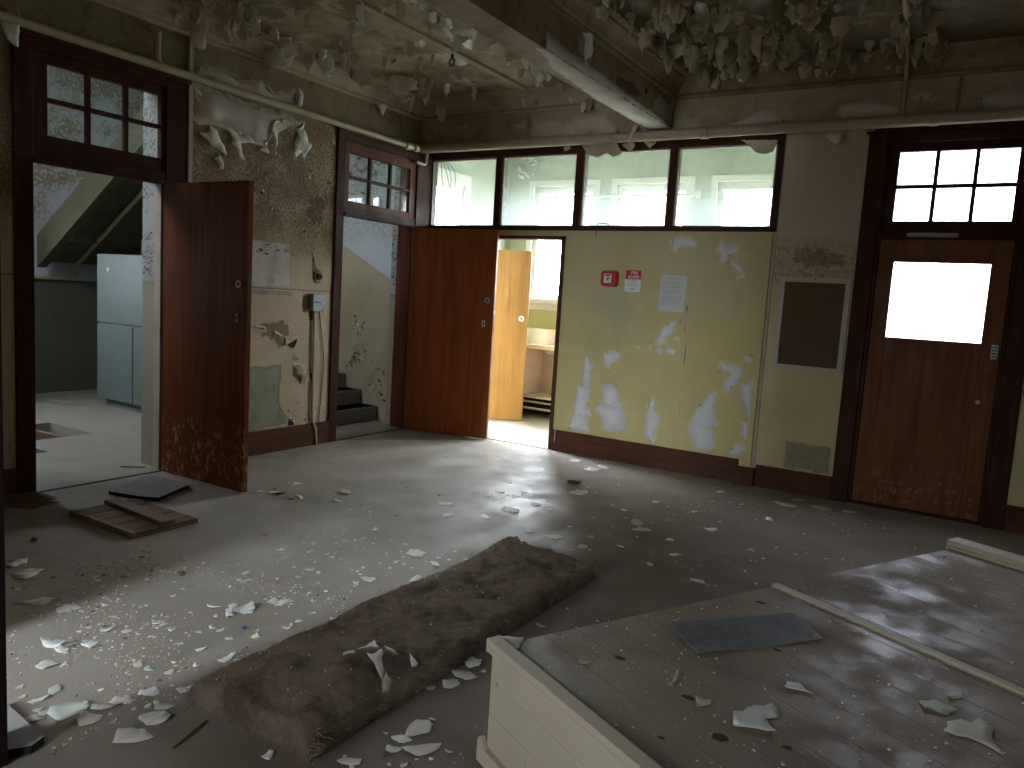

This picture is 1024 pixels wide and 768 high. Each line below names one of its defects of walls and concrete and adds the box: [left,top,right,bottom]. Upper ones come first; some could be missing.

peeling [349,0,496,122]
peeling [589,0,950,90]
peeling [193,64,320,256]
peeling [668,234,699,252]
spalling [253,324,315,385]
peeling [567,350,628,434]
peeling [643,396,662,444]
peeling [636,319,681,356]
peeling [687,354,755,458]